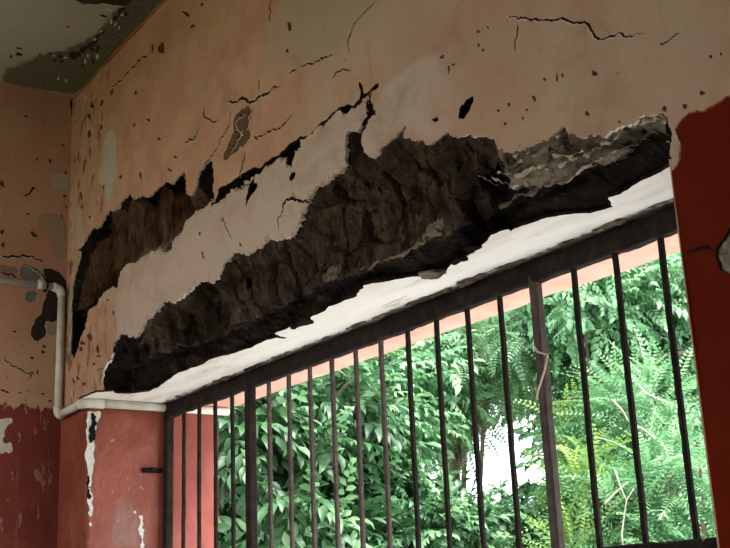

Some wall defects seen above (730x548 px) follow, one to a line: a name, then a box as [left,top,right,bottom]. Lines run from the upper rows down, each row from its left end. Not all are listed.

peeling [38,31,104,67]
crack [507,15,644,51]
crack [658,32,680,46]
crack [184,1,379,239]
flaking render [461,98,473,119]
crack [0,254,45,280]
flaking render [0,124,221,365]
flaking render [103,104,680,392]
crack [687,245,715,254]
flaking render [718,233,730,273]
peeling [0,418,13,454]
flaking render [85,411,101,517]